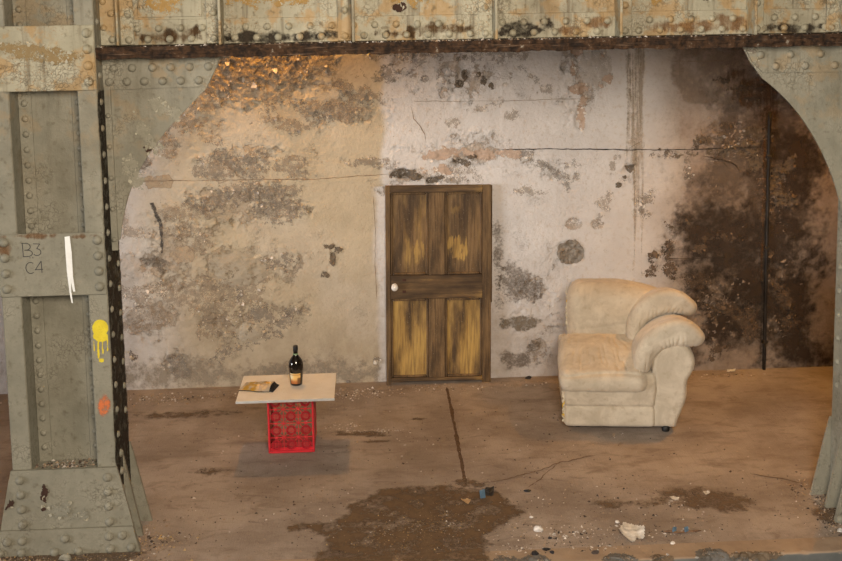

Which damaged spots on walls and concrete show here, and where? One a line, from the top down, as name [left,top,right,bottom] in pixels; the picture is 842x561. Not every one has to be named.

peeling [226,0,309,13]
peeling [0,41,85,67]
spalling [454,69,494,90]
peeling [568,49,613,131]
spalling [321,243,344,278]
spalling [557,239,584,264]
crack [445,387,595,487]
damp [287,485,525,561]
spalling [601,553,639,561]